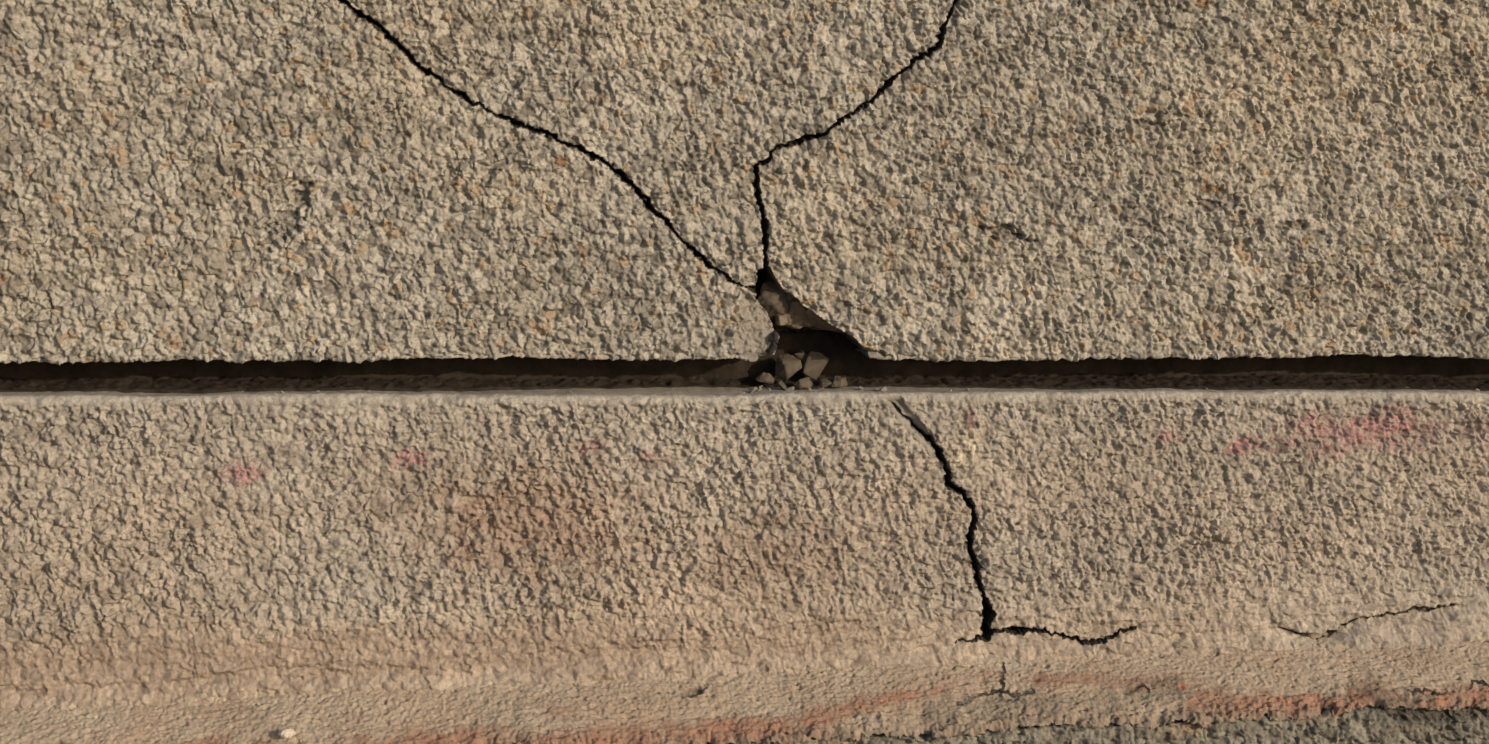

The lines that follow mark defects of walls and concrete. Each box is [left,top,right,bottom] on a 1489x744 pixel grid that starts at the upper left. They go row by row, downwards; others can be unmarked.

crack [338,0,959,293]
spalling [731,265,888,362]
crack [882,396,1137,710]
crack [1277,603,1460,640]